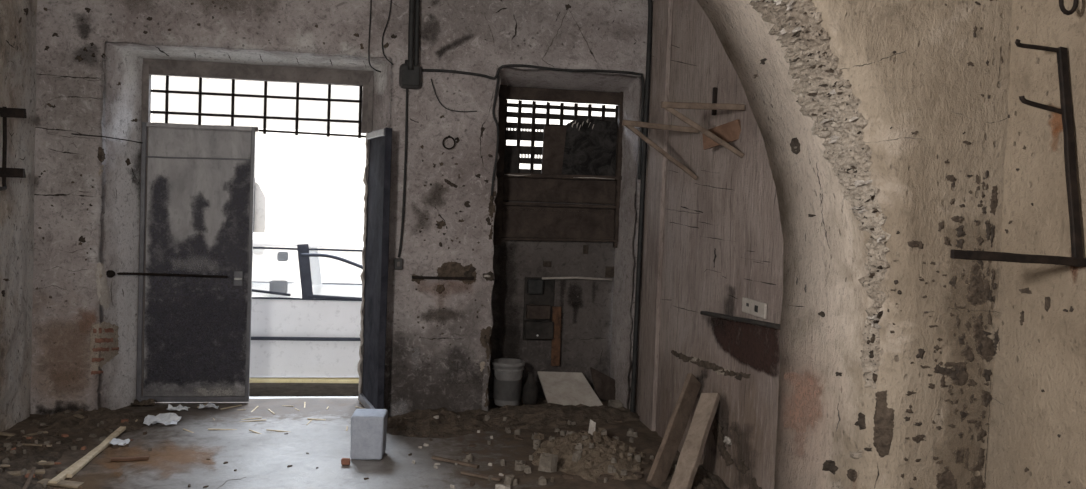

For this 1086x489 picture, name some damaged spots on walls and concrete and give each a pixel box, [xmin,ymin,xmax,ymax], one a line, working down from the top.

flaking render [78,236,124,375]
spalling [419,174,497,407]
spalling [671,350,751,381]
spalling [749,0,1012,489]
spalling [712,418,762,489]